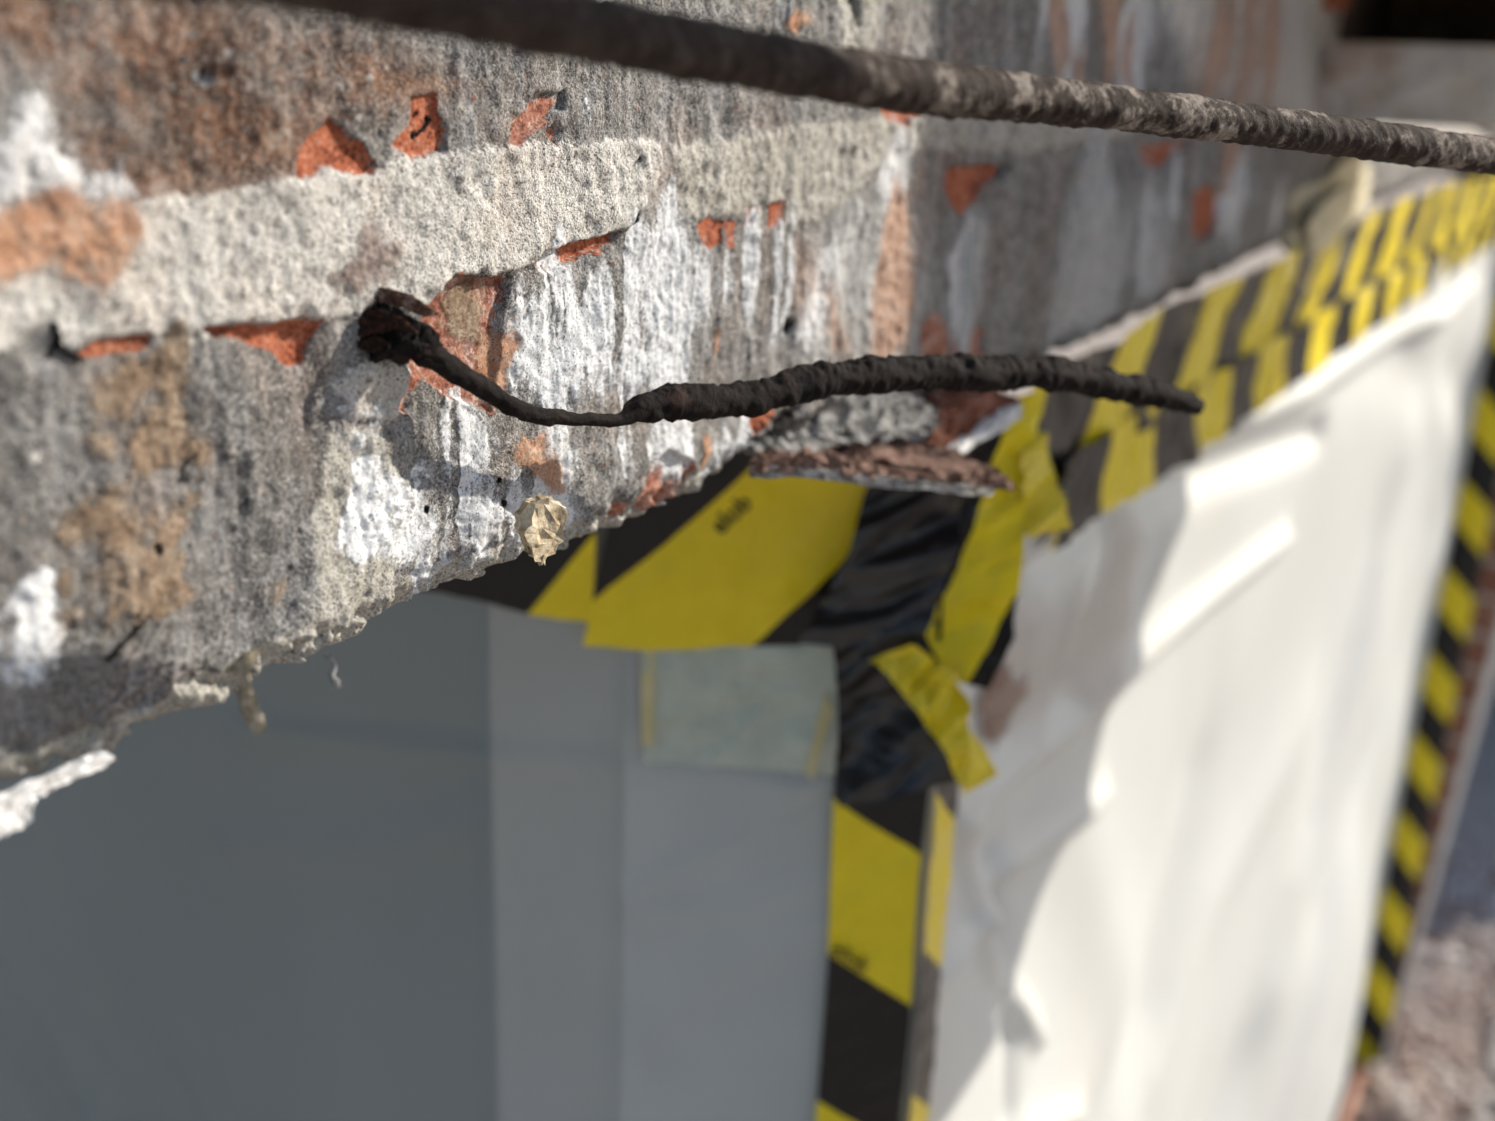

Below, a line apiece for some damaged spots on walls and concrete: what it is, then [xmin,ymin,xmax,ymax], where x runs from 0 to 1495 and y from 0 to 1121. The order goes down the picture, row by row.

spalling [191,0,1495,179]
corrosion [0,184,145,296]
corrosion [330,224,402,306]
corrosion [868,155,926,357]
crack [45,322,87,363]
spalling [202,317,324,367]
corrosion [435,279,520,390]
leakage [336,117,990,602]
spalling [357,271,1205,437]
corrosion [514,432,565,494]
spalling [514,493,568,566]
flaking render [0,750,115,837]